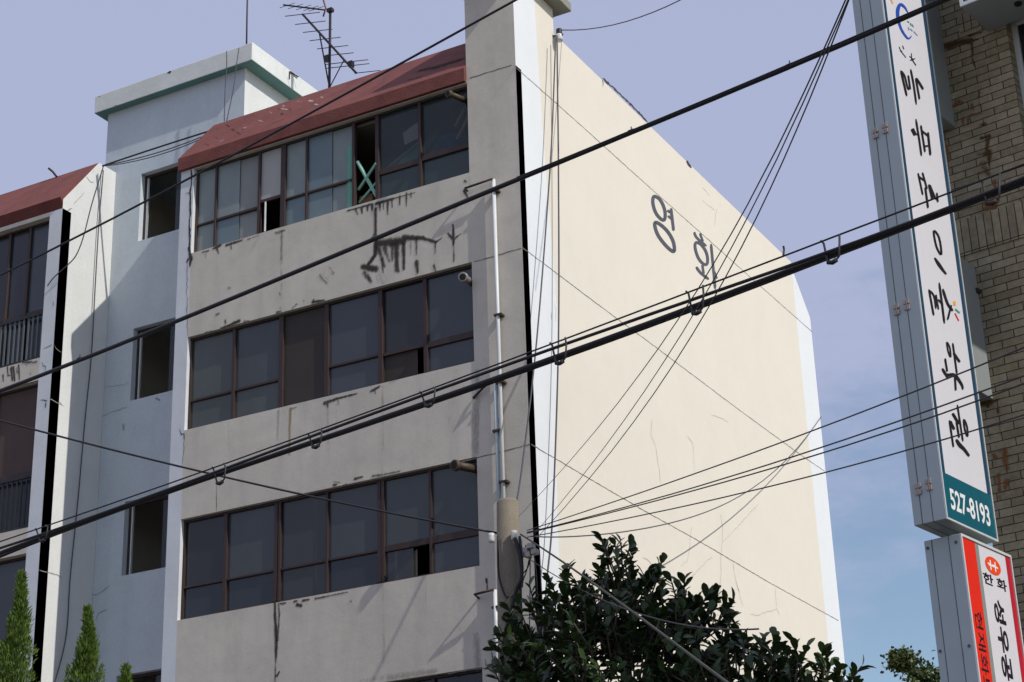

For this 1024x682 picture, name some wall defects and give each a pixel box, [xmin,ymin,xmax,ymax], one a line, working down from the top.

rust [944,32,982,66]
rust [952,92,999,210]
water stain [347,192,458,282]